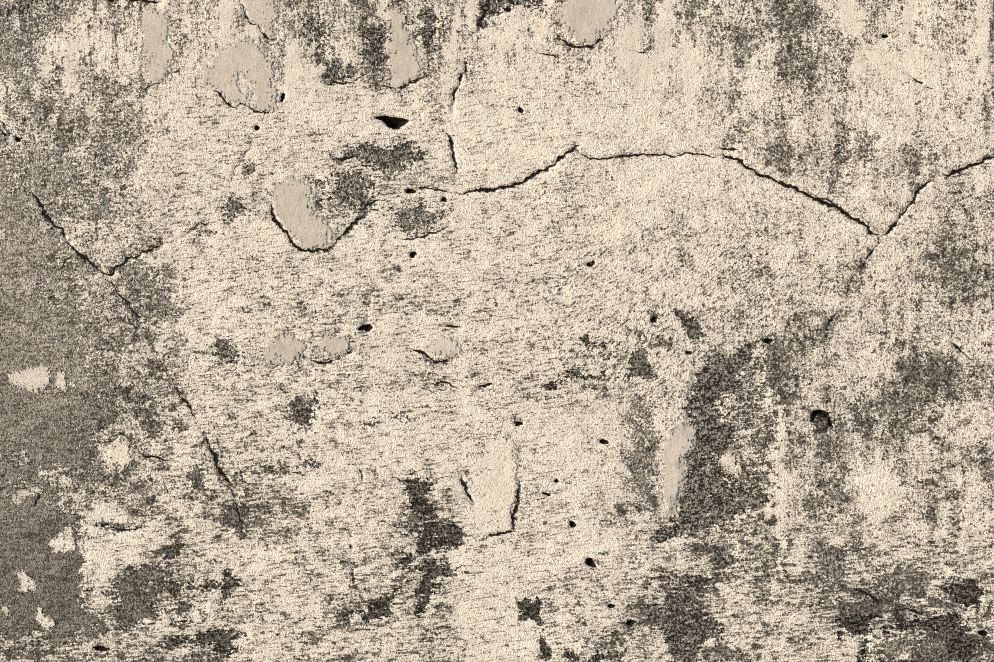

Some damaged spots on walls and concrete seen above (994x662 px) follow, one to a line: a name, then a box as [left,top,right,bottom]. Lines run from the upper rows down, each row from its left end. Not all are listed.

spalling [4,0,38,16]
peeling [202,0,280,115]
peeling [304,5,454,93]
peeling [474,0,621,48]
water stain [0,0,209,429]
spalling [241,159,259,180]
peeling [269,133,453,254]
crack [418,62,994,332]
spalling [0,79,250,659]
crack [26,189,242,529]
spalling [280,389,327,438]
crack [89,520,146,531]